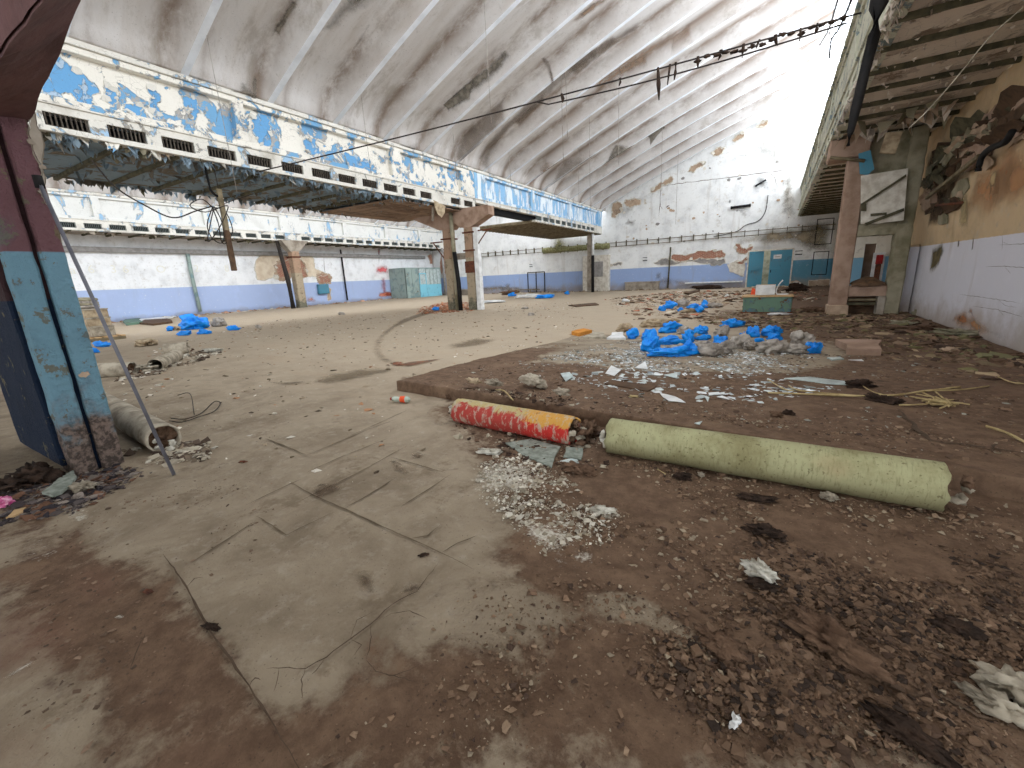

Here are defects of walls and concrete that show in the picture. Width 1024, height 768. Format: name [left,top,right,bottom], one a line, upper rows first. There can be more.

peeling [41,56,163,120]
peeling [181,95,203,121]
damp [444,53,506,109]
damp [460,32,627,158]
damp [598,40,665,88]
peeling [871,0,925,71]
peeling [26,112,430,218]
damp [605,145,634,164]
flaking render [788,62,1024,236]
flaking render [254,243,333,301]
flaking render [654,207,753,277]
crack [163,554,436,768]